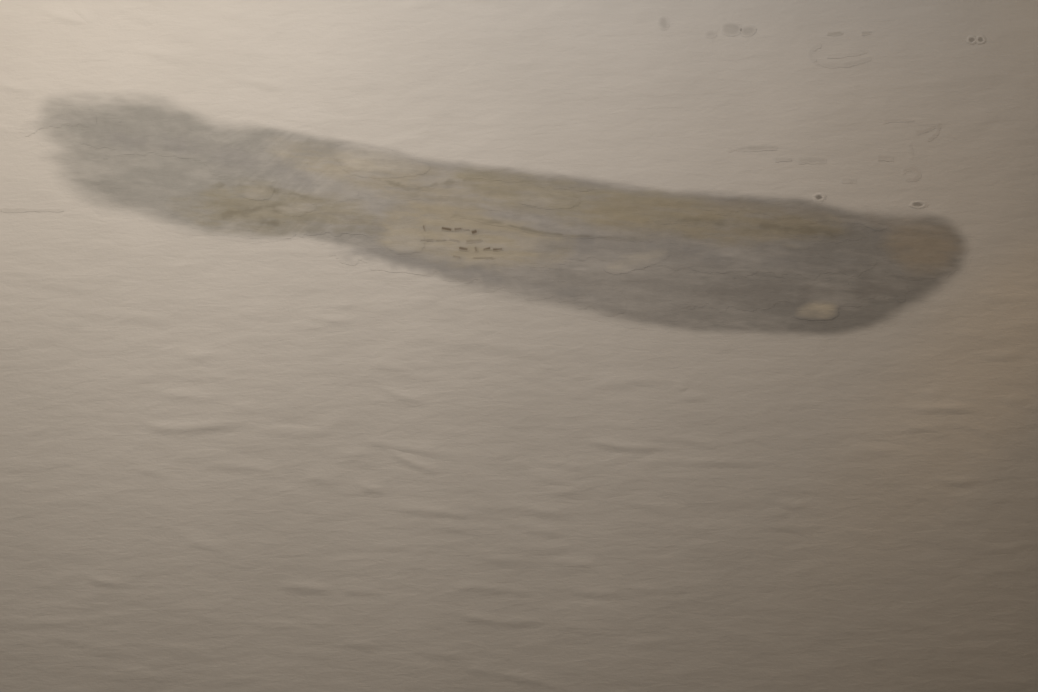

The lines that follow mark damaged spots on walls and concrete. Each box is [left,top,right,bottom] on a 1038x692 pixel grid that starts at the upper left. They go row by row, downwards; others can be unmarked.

damp [19,88,973,340]